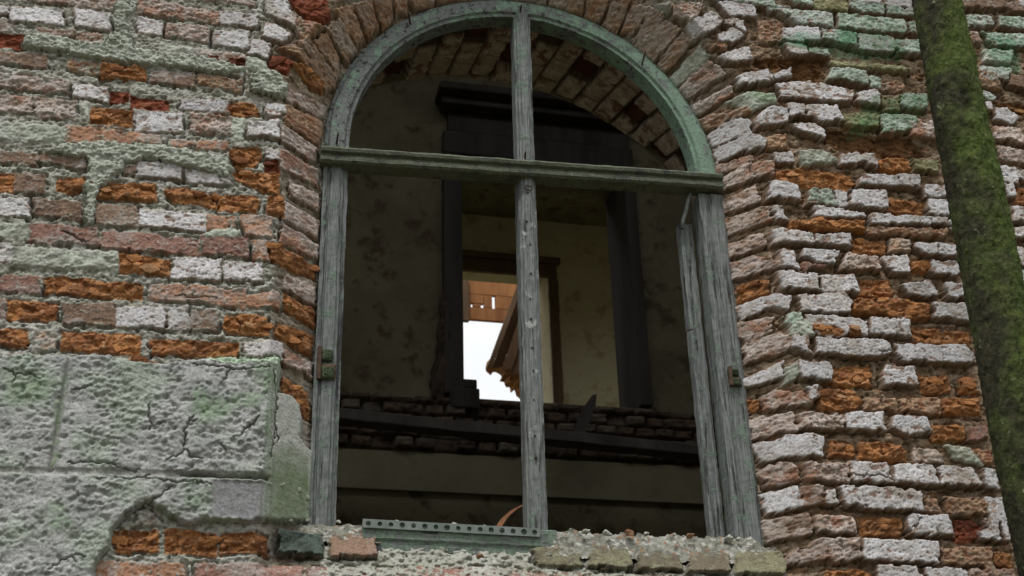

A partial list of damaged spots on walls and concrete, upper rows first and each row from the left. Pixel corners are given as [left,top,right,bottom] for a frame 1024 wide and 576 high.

crack [69,407,208,526]
crack [198,364,279,453]